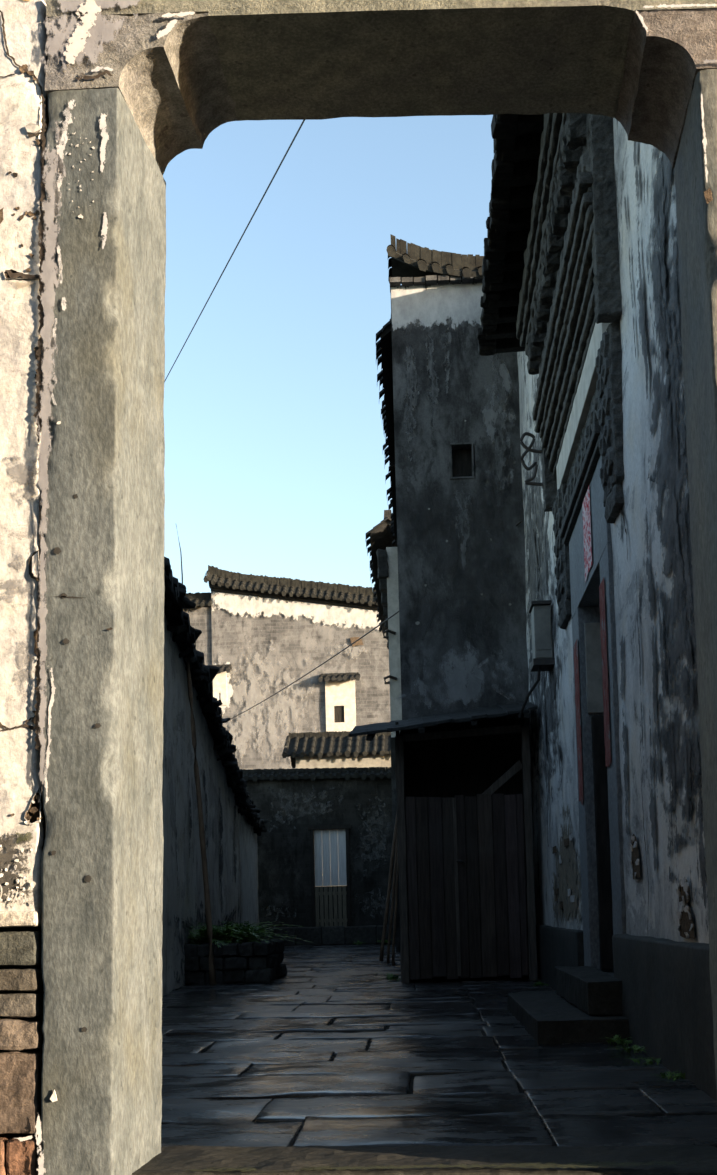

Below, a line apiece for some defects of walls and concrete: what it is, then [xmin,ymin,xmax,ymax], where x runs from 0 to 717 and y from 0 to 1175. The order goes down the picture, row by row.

crack [0,10,45,104]
water stain [624,141,708,913]
crack [0,711,42,749]
flaking render [552,803,582,928]
flaking render [629,834,640,880]
flaking render [676,877,695,939]